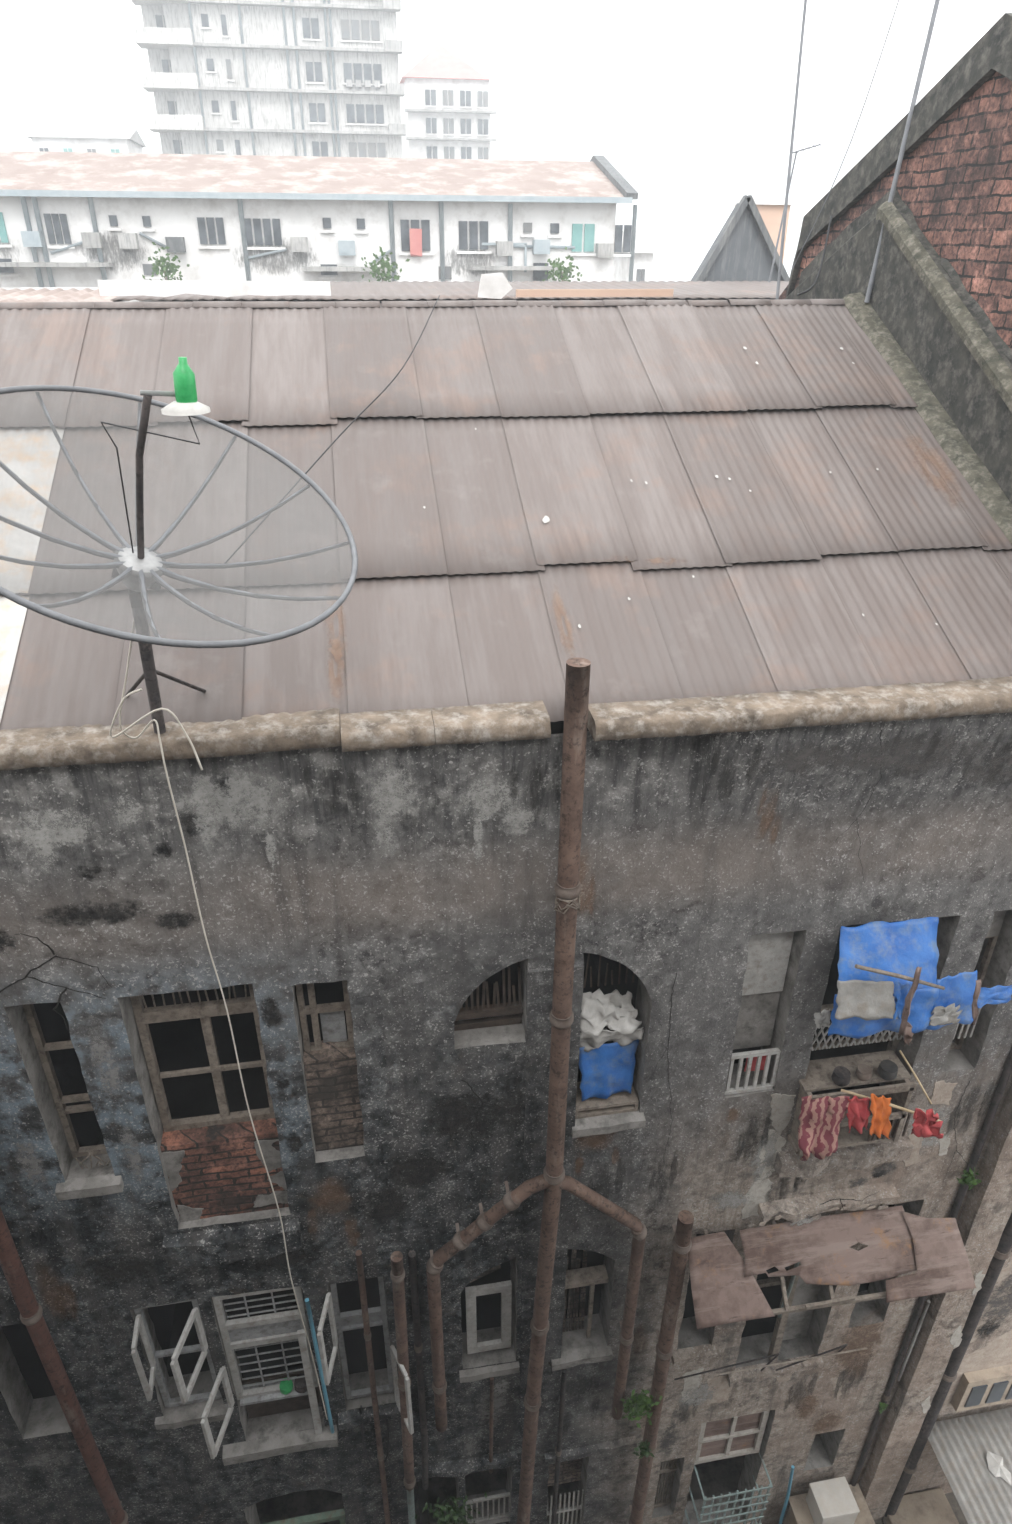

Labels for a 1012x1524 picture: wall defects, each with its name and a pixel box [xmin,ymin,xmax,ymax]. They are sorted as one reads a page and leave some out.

damp [20,808,95,870]
damp [153,843,172,857]
damp [175,772,287,866]
damp [304,768,421,858]
damp [460,768,559,858]
damp [39,901,195,929]
peeling [260,998,281,1028]
crack [652,973,677,1166]
spalling [162,1150,204,1222]
spalling [253,1133,303,1208]
damp [240,1153,447,1272]
damp [411,1384,430,1421]